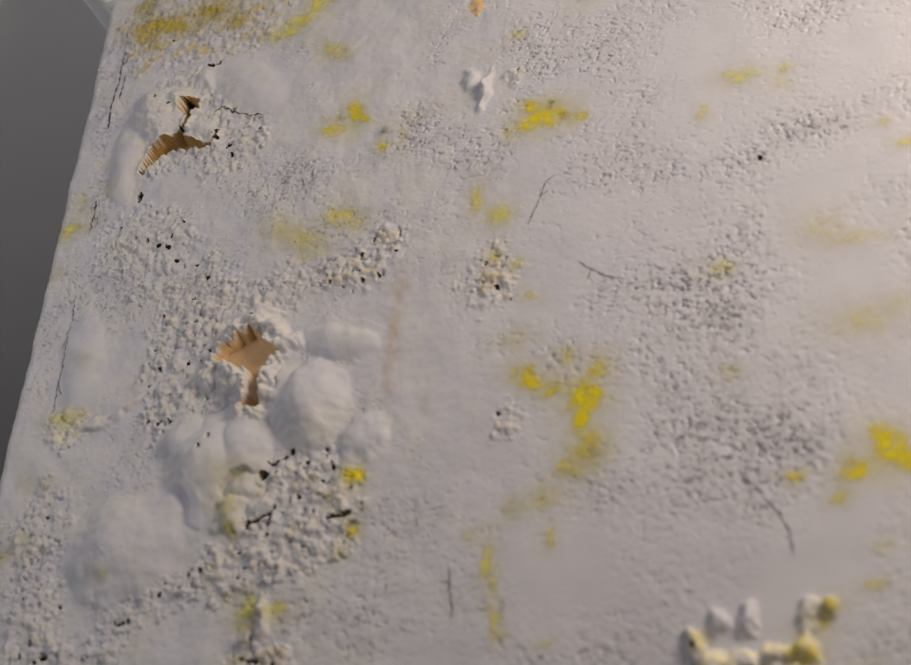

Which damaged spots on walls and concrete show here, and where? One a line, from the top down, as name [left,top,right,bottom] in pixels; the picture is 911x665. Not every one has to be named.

mould [135,19,187,43]
mould [273,0,333,39]
peeling [92,0,413,444]
mould [512,366,558,396]
mould [567,361,605,456]
mould [842,423,911,480]